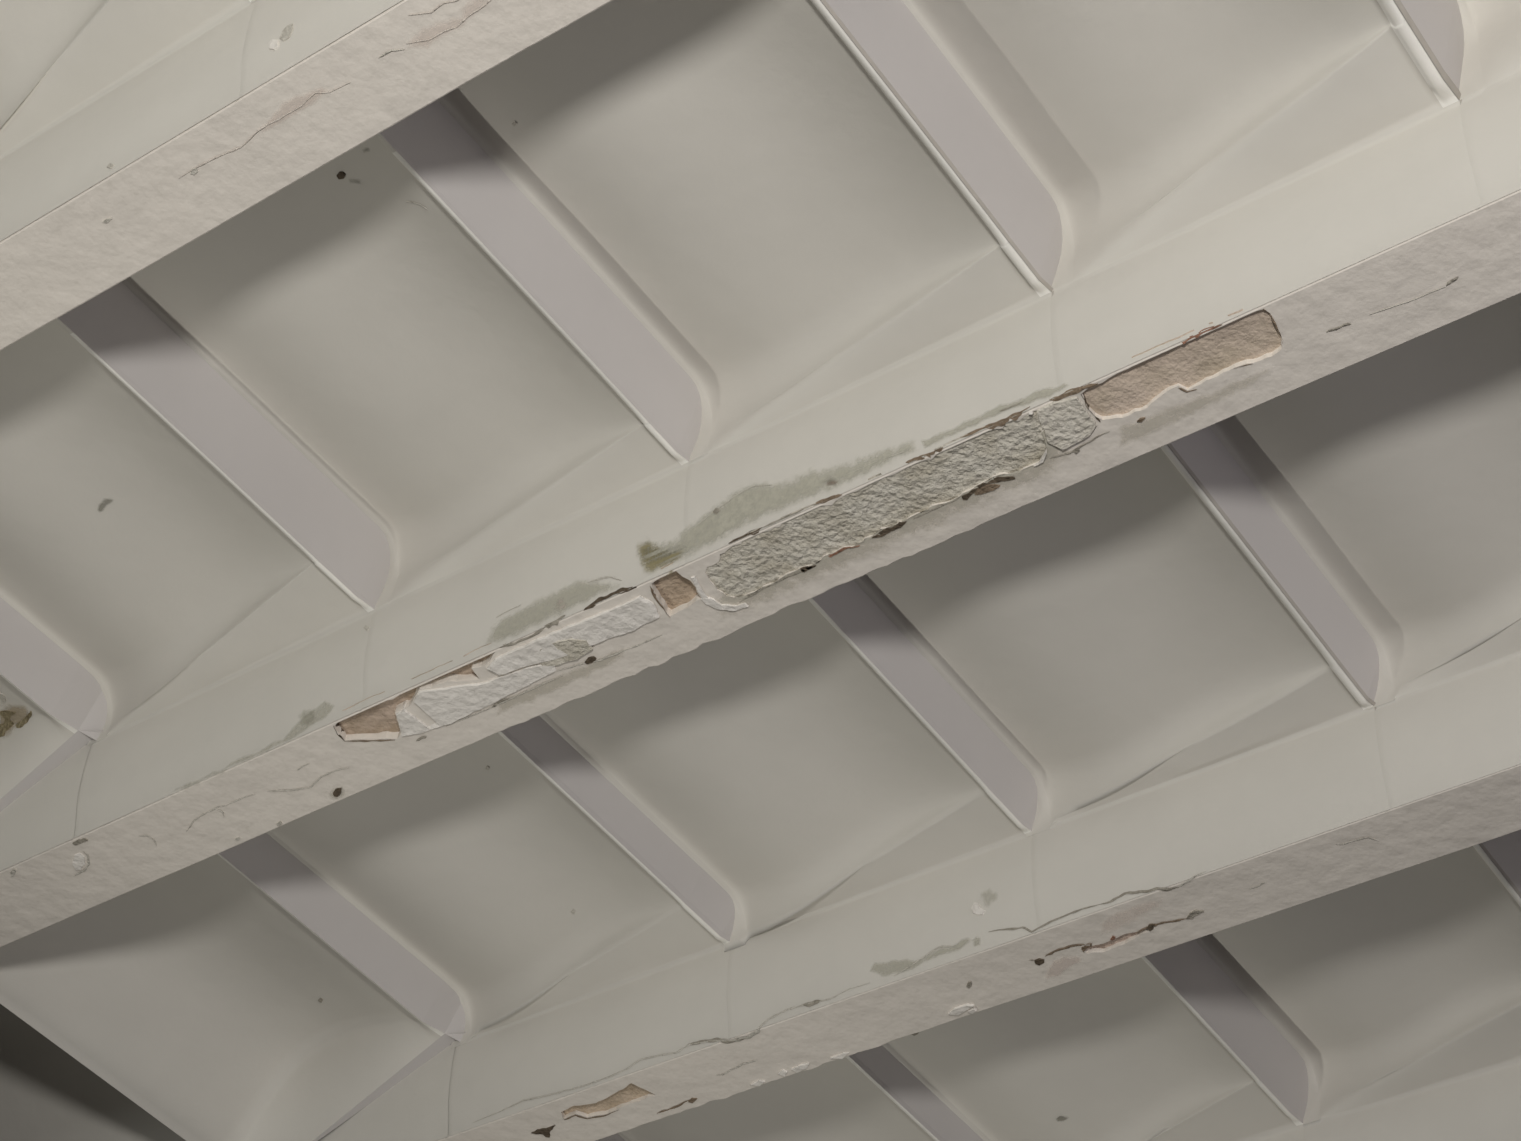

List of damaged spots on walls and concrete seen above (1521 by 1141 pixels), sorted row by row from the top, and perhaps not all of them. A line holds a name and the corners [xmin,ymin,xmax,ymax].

peeling [334,309,1283,742]
spalling [531,1083,651,1137]
crack [473,871,1205,1123]